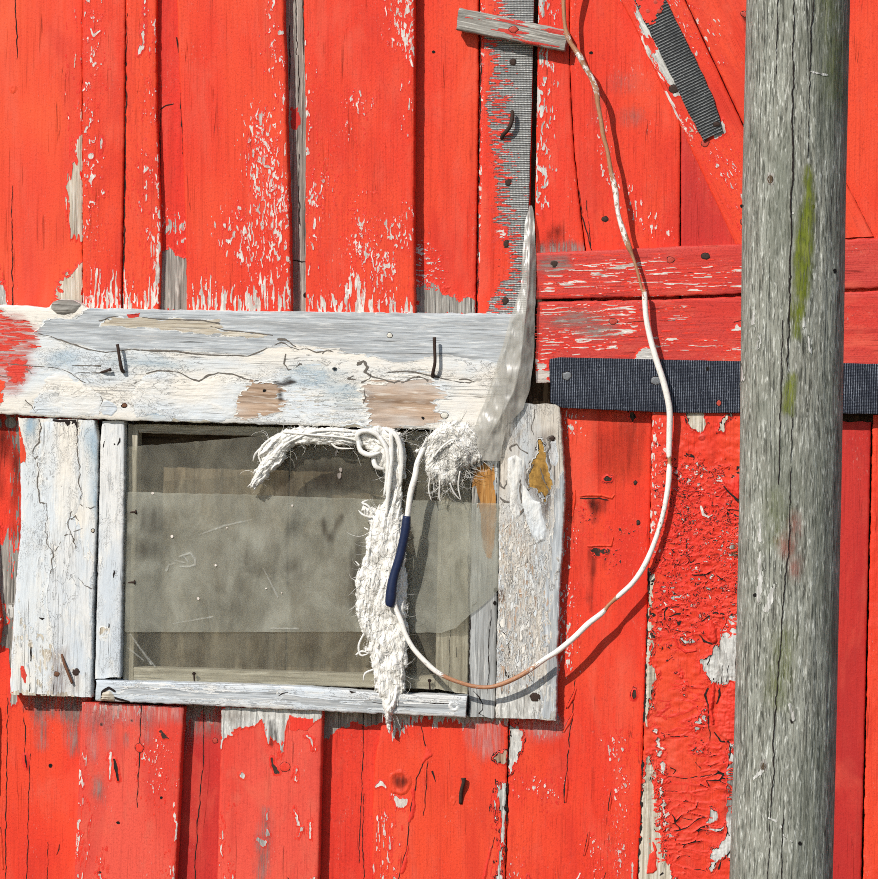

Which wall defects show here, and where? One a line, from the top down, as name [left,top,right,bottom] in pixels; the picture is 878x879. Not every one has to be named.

peeling [24,0,516,430]
peeling [620,0,743,241]
crack [0,317,333,406]
crack [347,360,475,403]
crack [648,479,739,879]